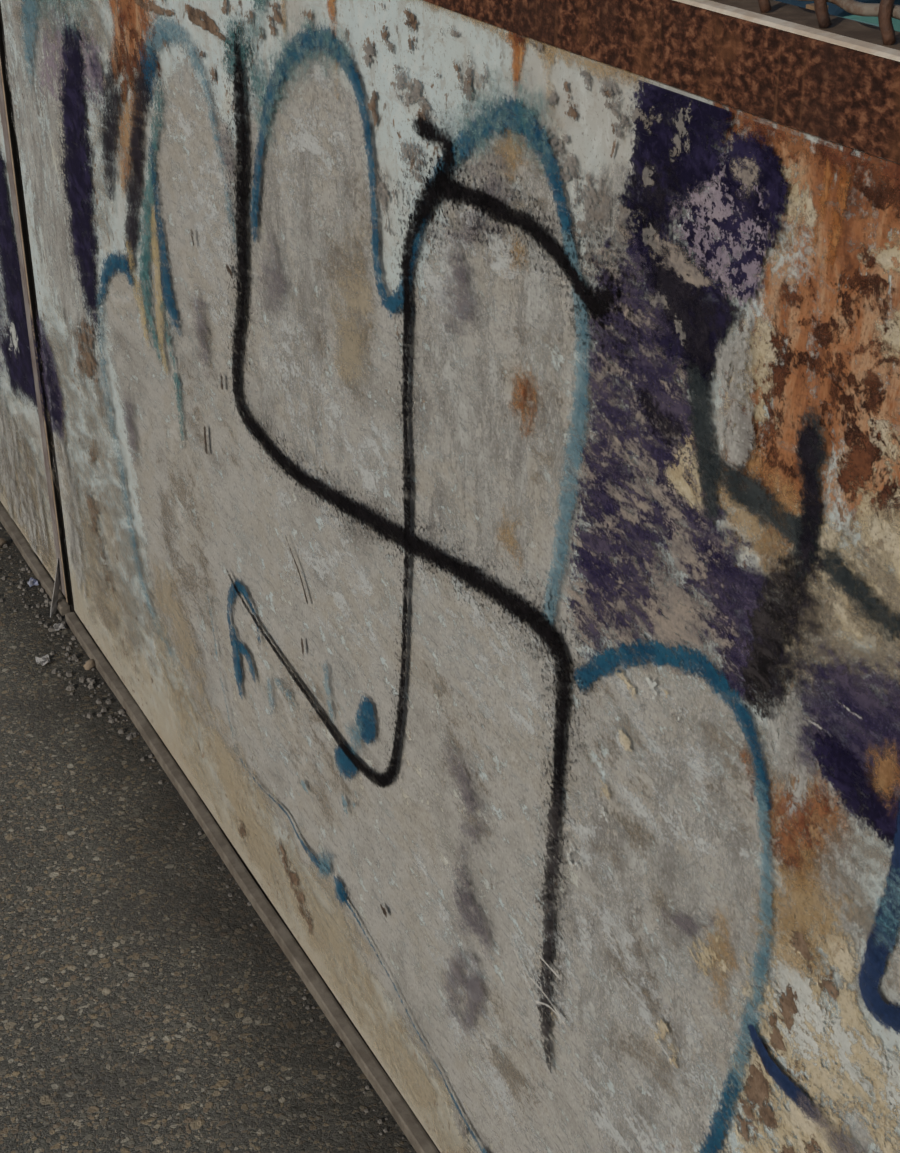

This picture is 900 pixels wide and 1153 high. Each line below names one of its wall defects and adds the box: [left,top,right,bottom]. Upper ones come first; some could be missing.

corrosion [108,0,227,191]
corrosion [327,0,337,40]
corrosion [425,1,644,89]
corrosion [713,101,900,579]
corrosion [740,749,849,895]